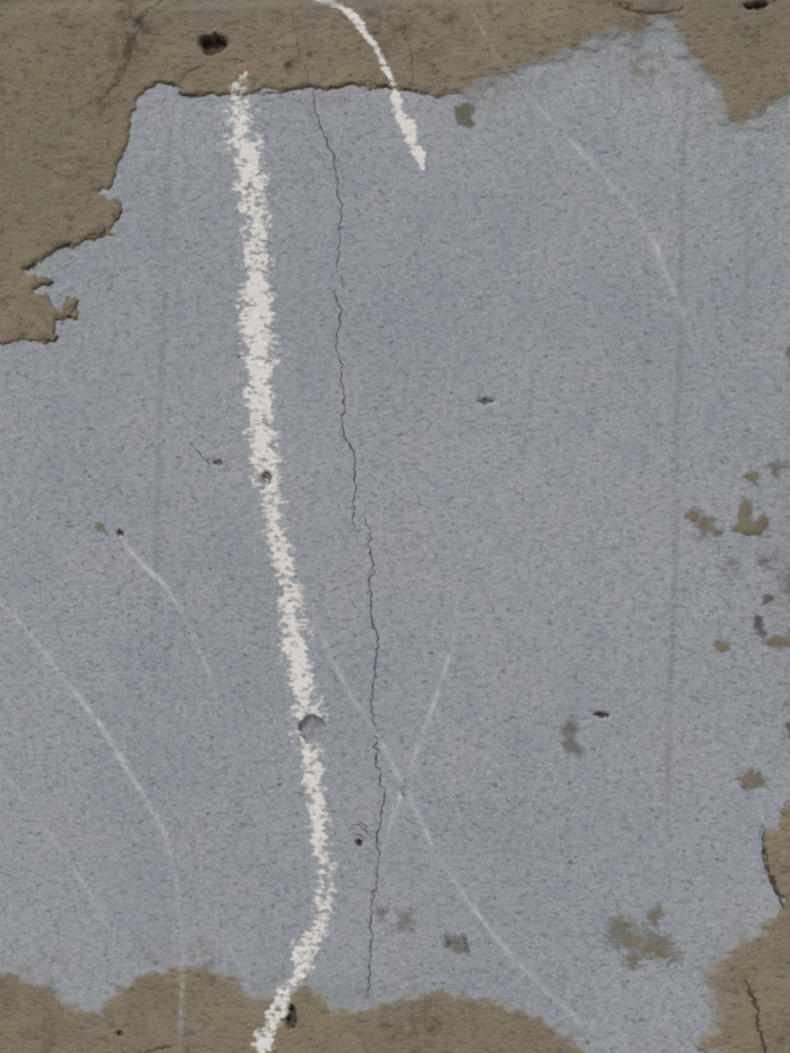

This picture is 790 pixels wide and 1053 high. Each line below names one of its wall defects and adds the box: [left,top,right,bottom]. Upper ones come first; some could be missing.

crack [255,9,433,997]
crack [761,830,784,909]
crack [745,981,767,1053]